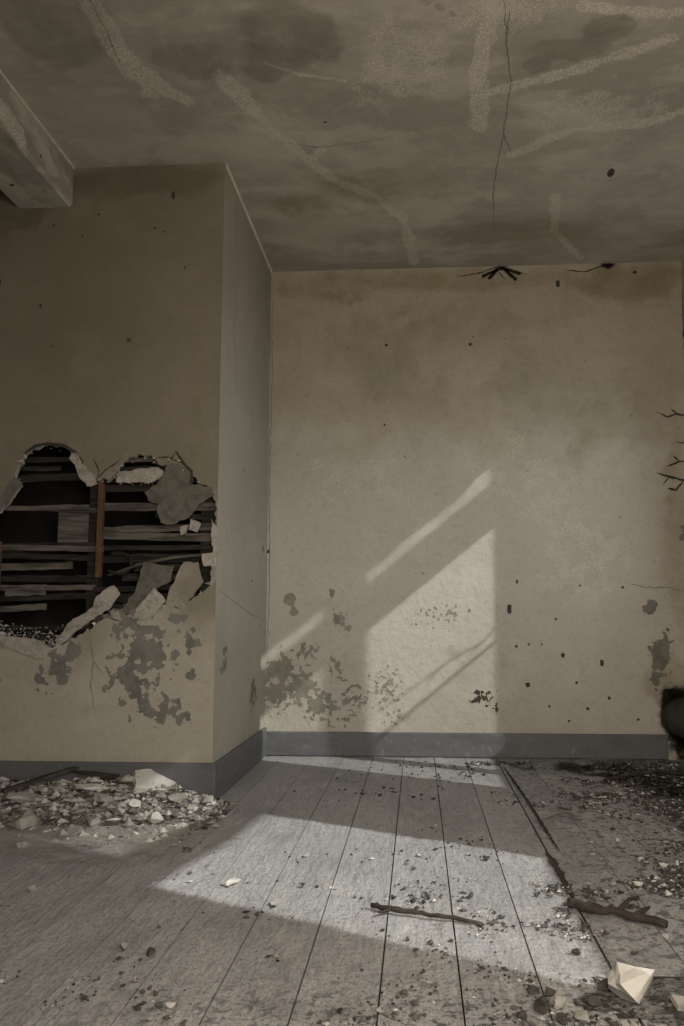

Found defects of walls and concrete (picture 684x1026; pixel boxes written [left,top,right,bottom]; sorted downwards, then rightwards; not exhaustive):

crack [492,0,512,228]
crack [676,269,684,338]
crack [657,409,684,491]
spalling [0,442,218,728]
peeling [250,588,415,728]
peeling [647,628,674,691]